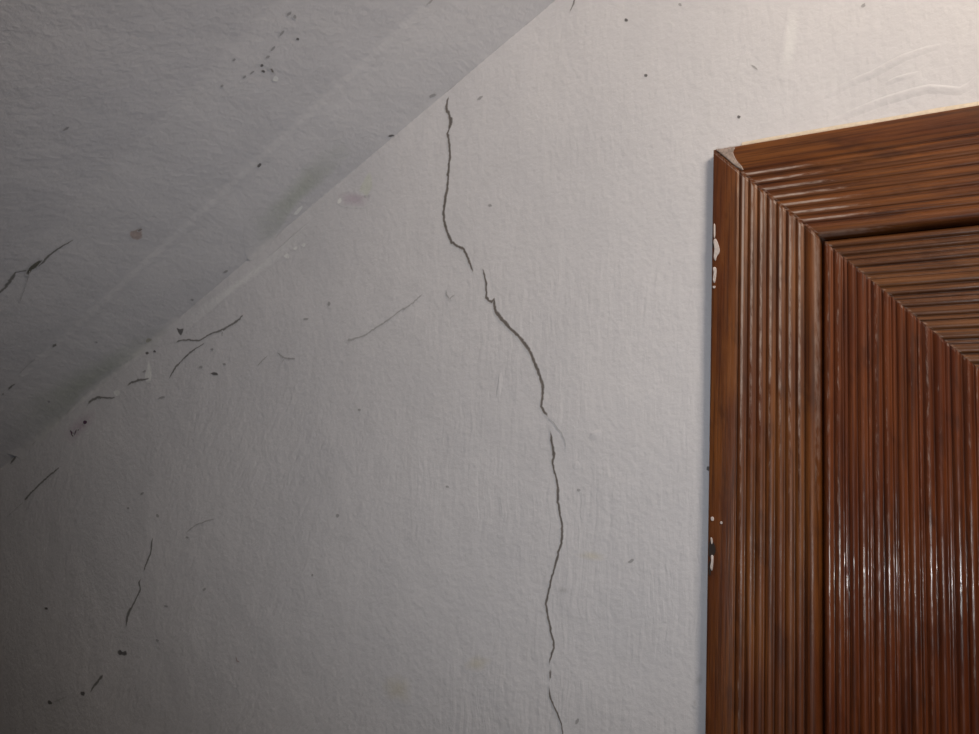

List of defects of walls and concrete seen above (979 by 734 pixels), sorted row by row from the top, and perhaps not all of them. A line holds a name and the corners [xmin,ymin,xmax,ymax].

crack [0,239,74,301]
crack [346,289,456,343]
crack [87,314,244,405]
crack [441,96,566,734]
crack [125,537,153,627]
crack [116,648,128,656]
crack [47,674,104,705]